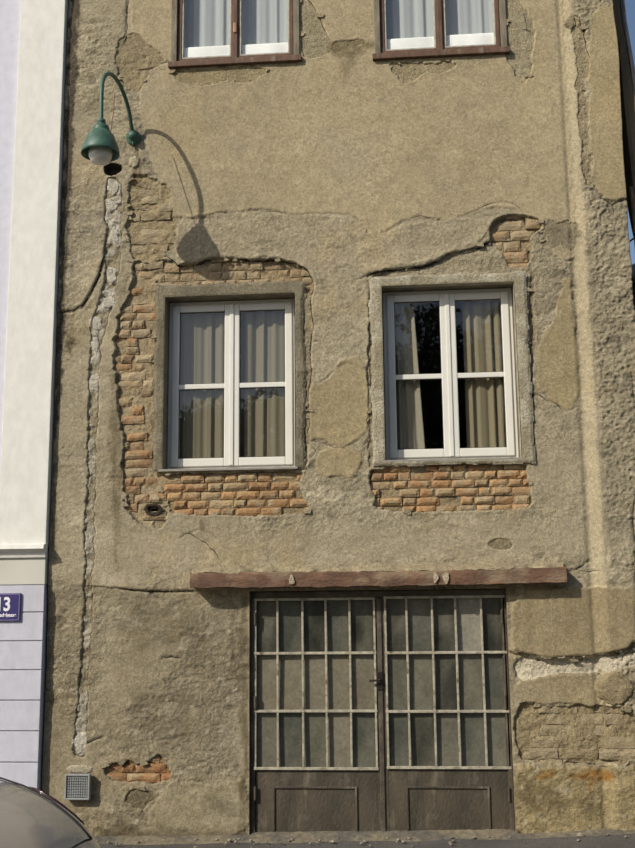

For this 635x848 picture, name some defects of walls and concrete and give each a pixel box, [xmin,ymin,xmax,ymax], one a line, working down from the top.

spalling [115,33,270,92]
spalling [571,16,592,187]
leakage [53,0,80,440]
flaking render [114,172,314,528]
flaking render [364,324,533,515]
spalling [373,215,582,378]
flaking render [101,755,171,812]
spalling [514,648,635,681]
spalling [514,699,635,766]